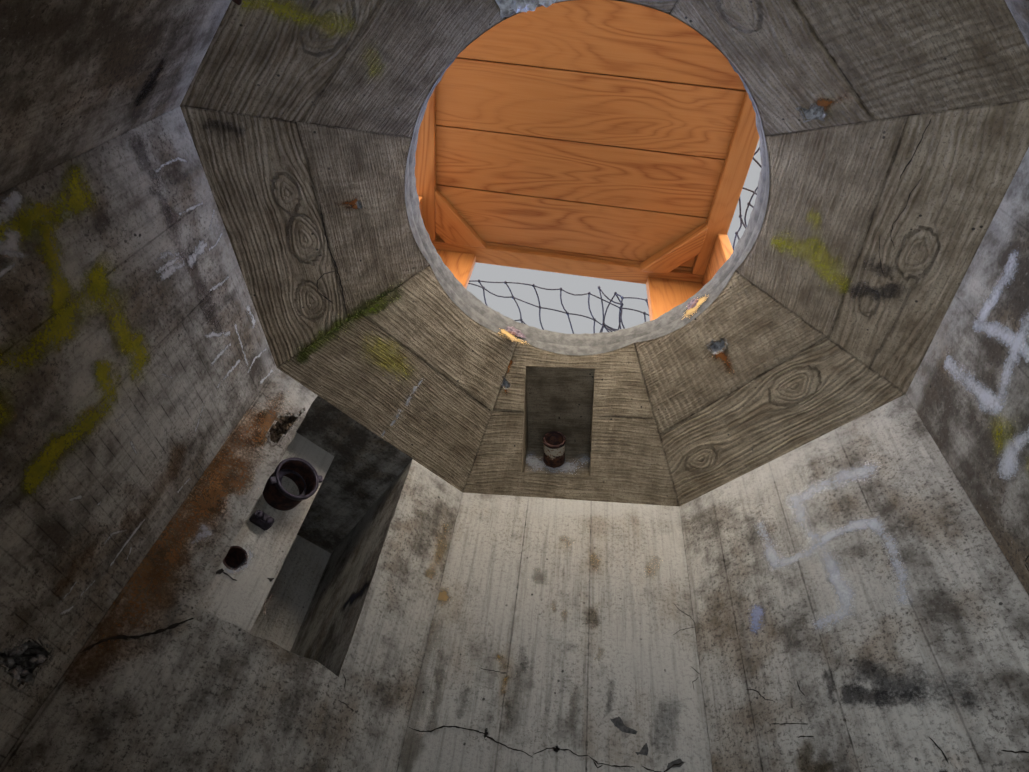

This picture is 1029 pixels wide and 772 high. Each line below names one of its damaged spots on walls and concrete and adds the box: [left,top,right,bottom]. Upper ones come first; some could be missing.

spalling [495,0,567,18]
corrosion [66,393,291,688]
crack [81,618,194,653]
spalling [0,634,54,693]
crack [409,726,684,772]